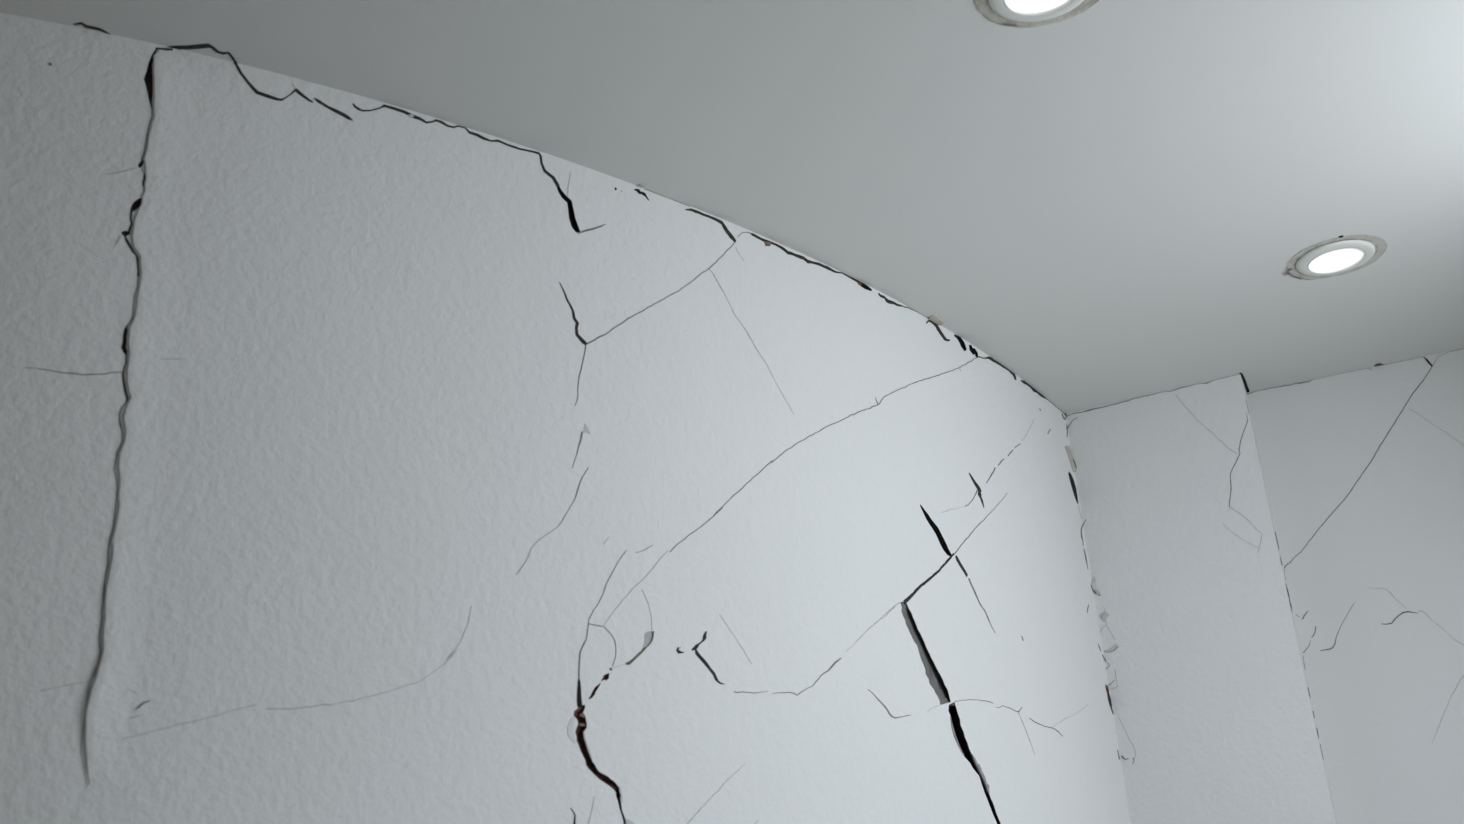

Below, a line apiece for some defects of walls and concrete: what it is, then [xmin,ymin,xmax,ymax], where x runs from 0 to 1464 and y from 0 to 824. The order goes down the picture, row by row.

crack [74,22,110,34]
crack [26,43,605,788]
crack [516,184,1464,824]